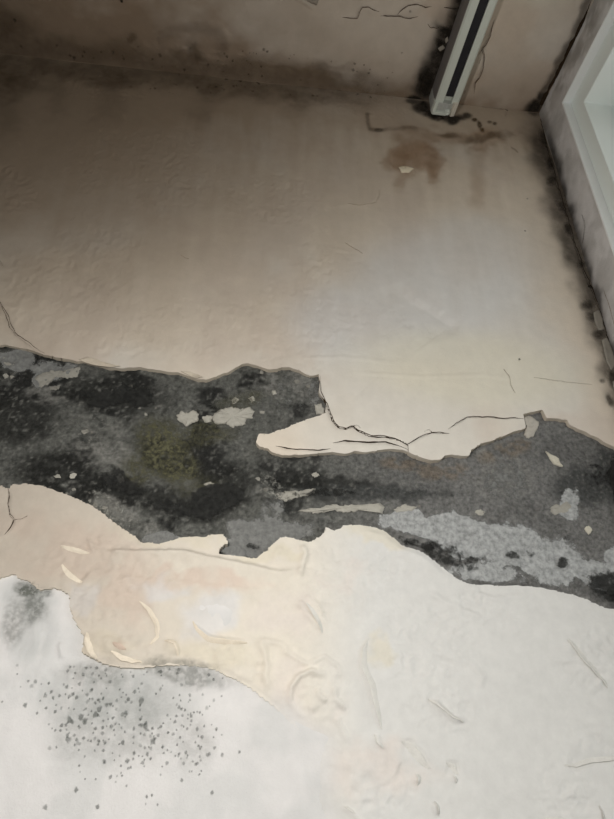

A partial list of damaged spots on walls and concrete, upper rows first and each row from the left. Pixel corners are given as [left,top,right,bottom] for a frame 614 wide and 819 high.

crack [343,4,452,29]
mould [407,0,461,118]
mould [534,137,608,346]
crack [278,381,523,451]
leakage [18,585,38,597]
spalling [0,347,614,819]